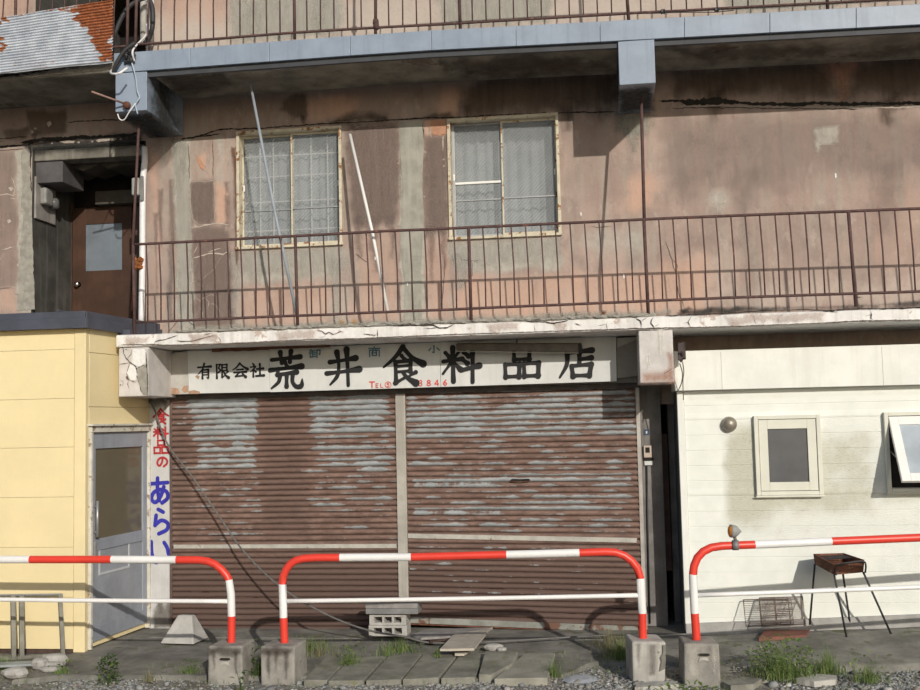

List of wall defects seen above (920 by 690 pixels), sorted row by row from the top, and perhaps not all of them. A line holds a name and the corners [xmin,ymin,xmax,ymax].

crack [0,119,141,199]
leakage [19,112,141,152]
leakage [335,115,396,230]
crack [661,96,920,110]
crack [121,111,920,391]
spalling [120,338,148,395]